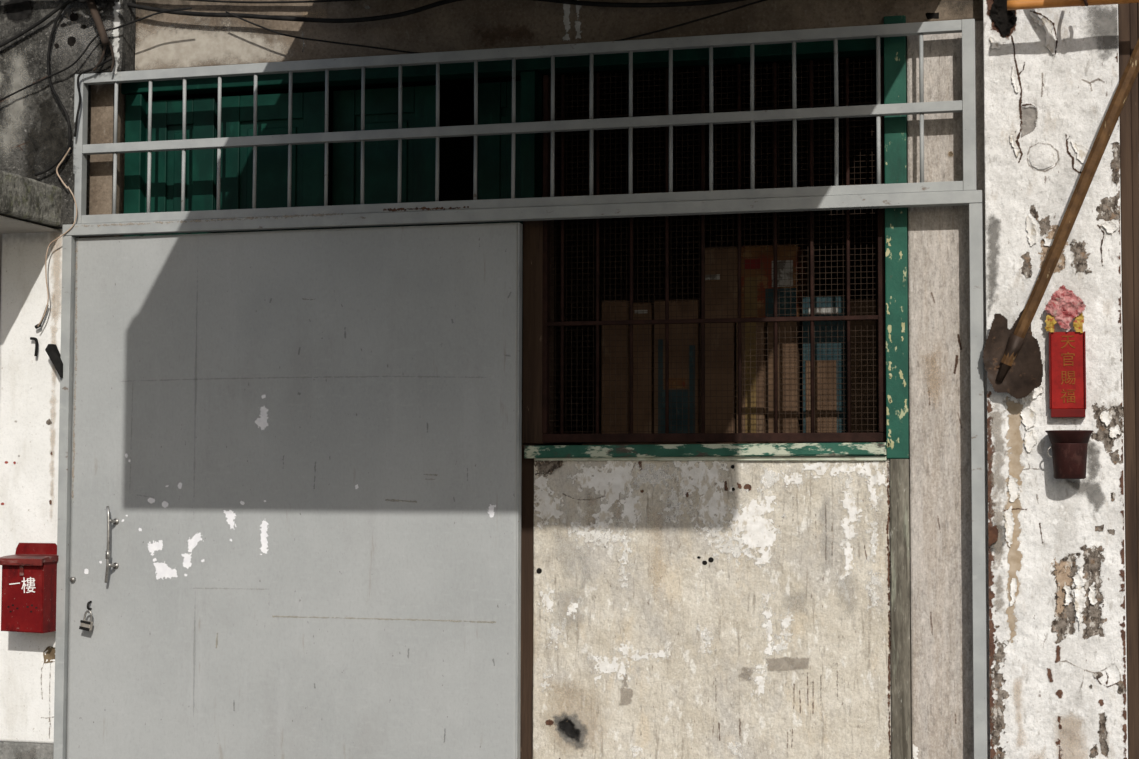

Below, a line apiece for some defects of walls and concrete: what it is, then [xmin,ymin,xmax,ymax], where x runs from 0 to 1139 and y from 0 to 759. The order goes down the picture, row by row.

spalling [989,0,1058,55]
crack [1010,36,1044,163]
spalling [1021,106,1037,137]
spalling [1021,142,1120,278]
spalling [887,361,907,449]
peeling [534,460,889,611]
peeling [1004,386,1044,643]
spalling [1050,545,1107,644]